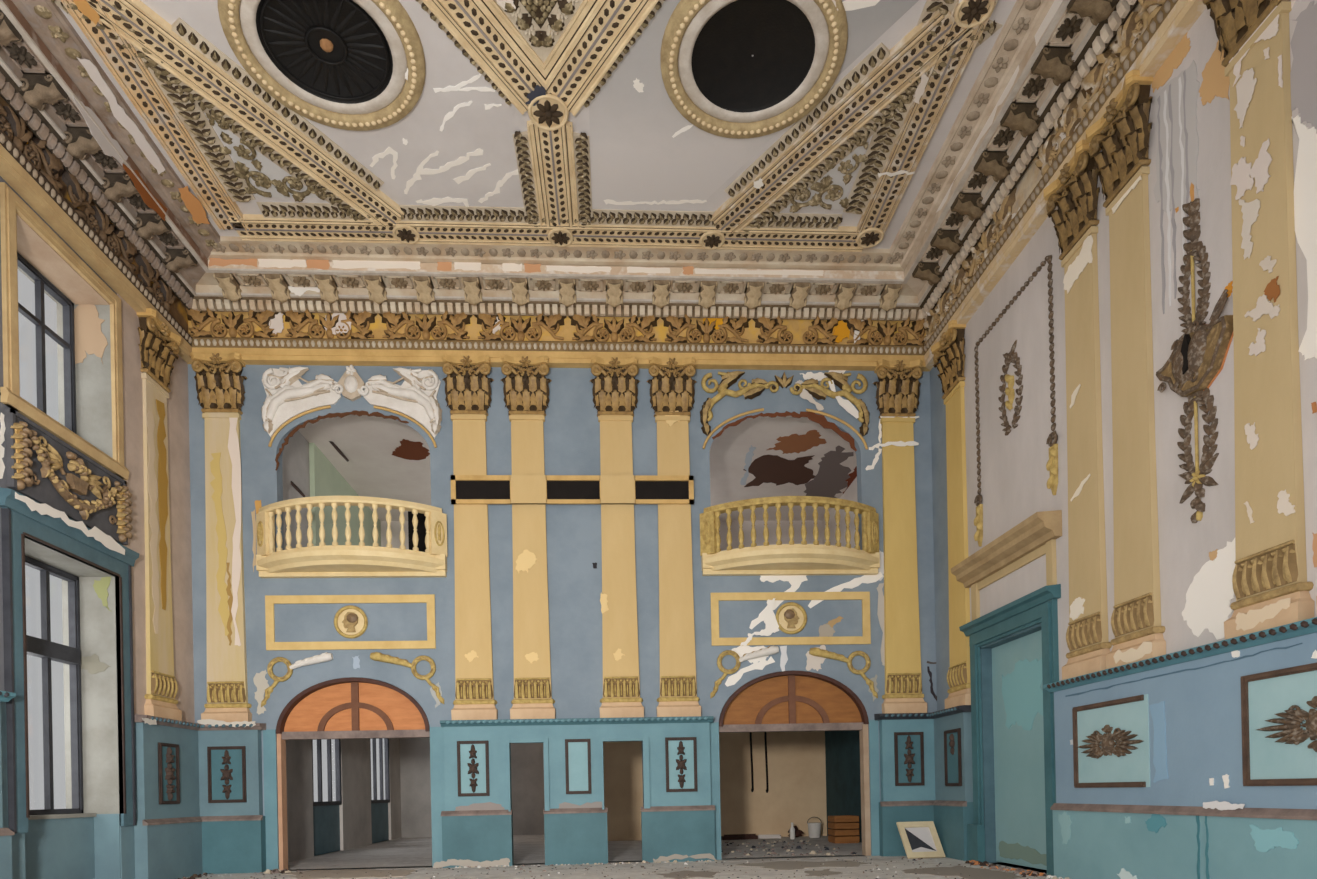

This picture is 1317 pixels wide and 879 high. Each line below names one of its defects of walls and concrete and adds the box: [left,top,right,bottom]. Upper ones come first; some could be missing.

flaking render [1112,0,1317,360]
flaking render [275,410,409,471]
flaking render [392,439,430,460]
flaking render [712,380,857,498]
flaking render [806,624,835,671]
flaking render [1182,538,1291,658]